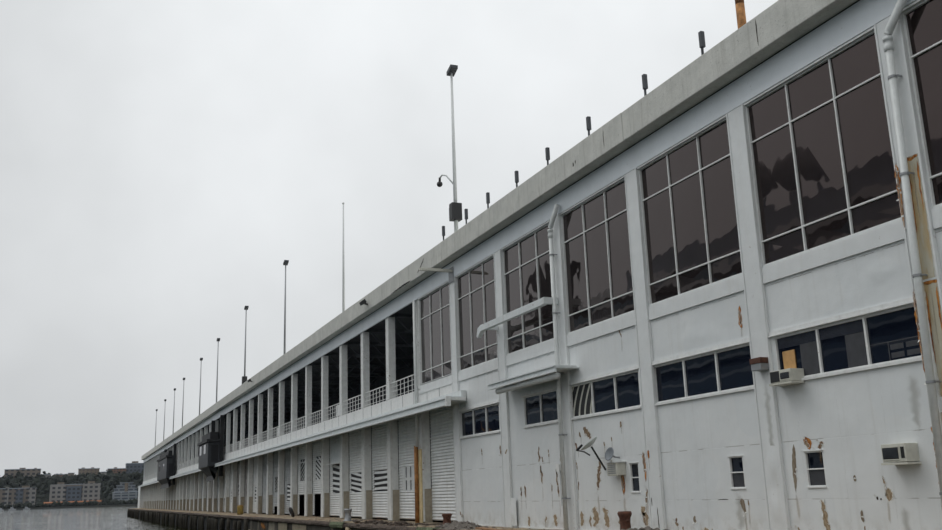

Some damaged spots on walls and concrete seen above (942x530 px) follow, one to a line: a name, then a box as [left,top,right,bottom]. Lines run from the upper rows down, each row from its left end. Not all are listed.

corrosion [895,154,942,396]
peeling [578,506,620,529]
peeling [641,488,649,526]
peeling [819,499,831,530]